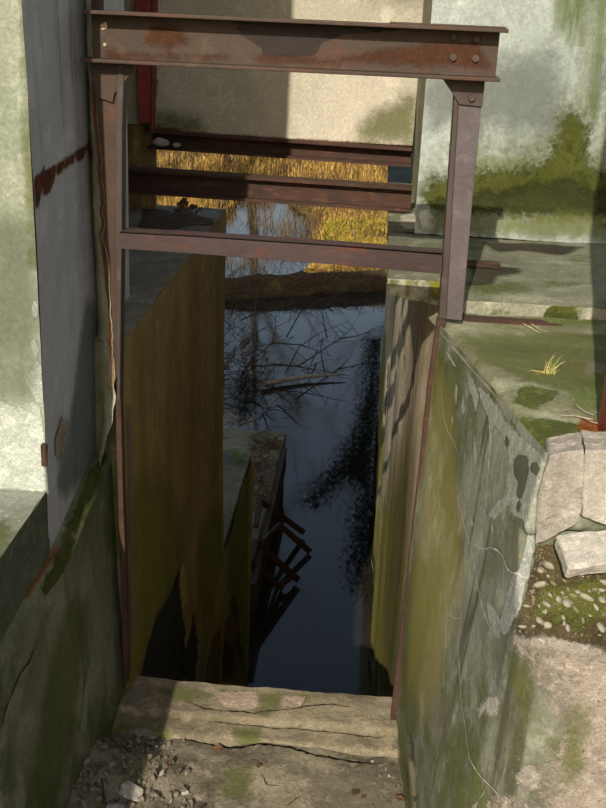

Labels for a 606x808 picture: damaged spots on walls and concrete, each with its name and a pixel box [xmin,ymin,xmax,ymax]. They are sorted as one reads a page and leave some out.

rust [145,25,188,60]
rust [347,43,486,67]
water stain [428,79,453,125]
water stain [480,62,554,125]
rust [35,89,108,284]
water stain [470,212,606,254]
crack [455,422,528,629]
crack [443,605,498,798]
efflorescence [478,694,499,718]
crack [173,702,382,764]
efflorescence [515,765,541,791]